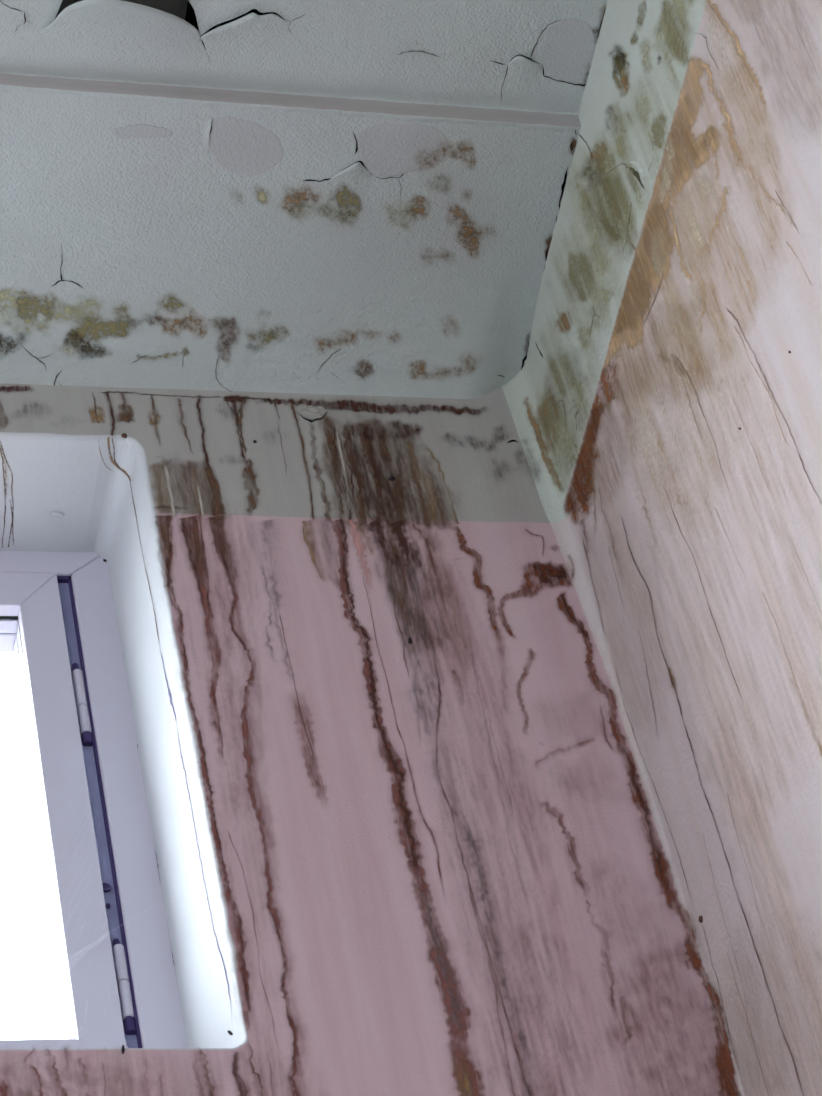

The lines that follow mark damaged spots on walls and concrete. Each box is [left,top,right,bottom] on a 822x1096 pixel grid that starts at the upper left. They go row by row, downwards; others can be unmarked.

peeling [39,0,304,72]
water stain [335,186,360,216]
water stain [410,196,427,215]
water stain [450,205,481,256]
water stain [569,0,753,434]
water stain [0,289,129,355]
water stain [150,296,205,335]
water stain [219,318,236,352]
water stain [558,314,570,332]
water stain [524,361,583,489]
rust [501,531,739,1096]